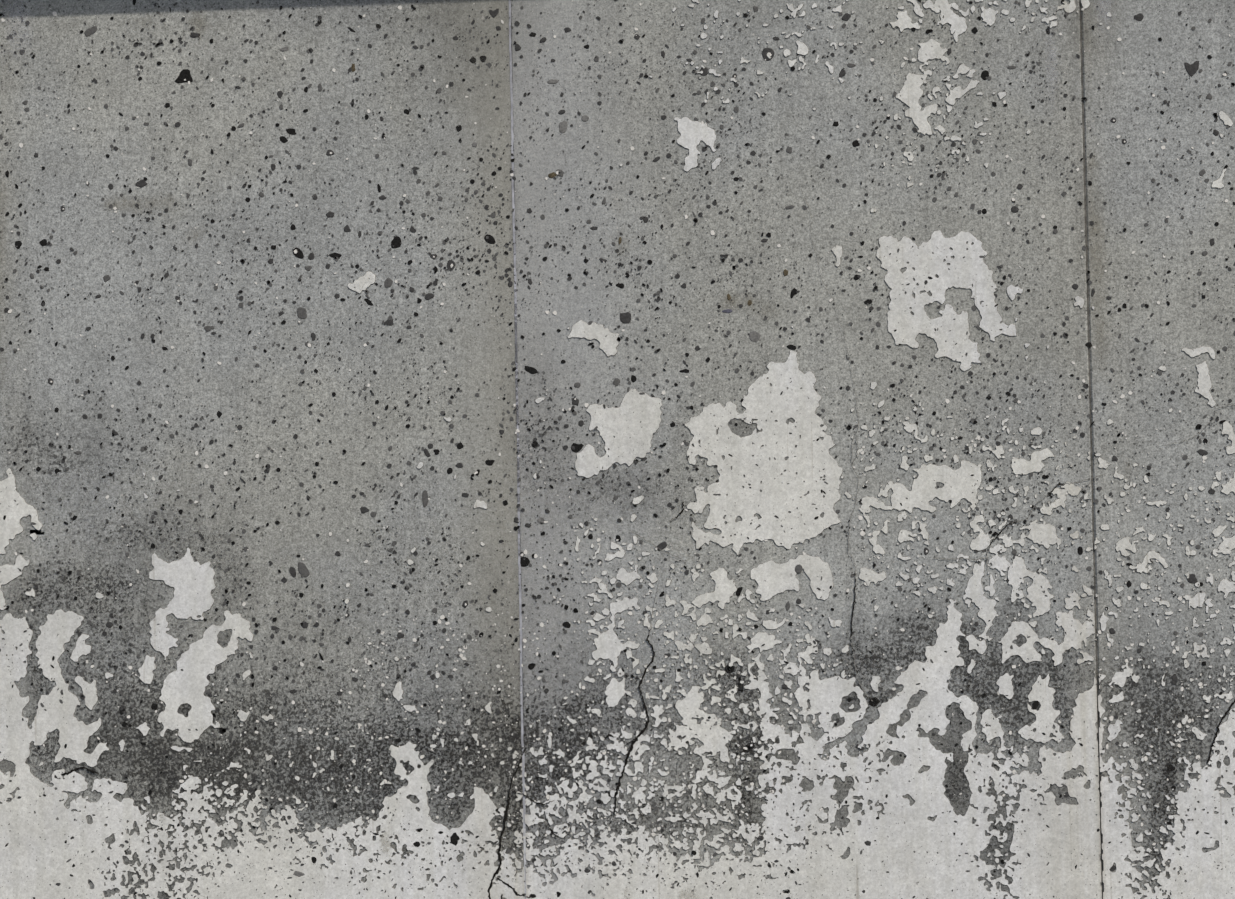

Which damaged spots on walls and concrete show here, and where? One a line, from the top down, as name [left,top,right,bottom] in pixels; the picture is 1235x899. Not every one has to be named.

peeling [674,117,722,172]
peeling [672,0,884,104]
peeling [868,0,1090,188]
peeling [1218,111,1233,138]
peeling [347,271,376,294]
peeling [567,320,619,357]
peeling [876,230,1030,371]
crack [631,500,685,561]
peeling [0,346,1235,899]
crack [596,583,659,839]
crack [1207,700,1235,763]
crack [488,743,557,899]